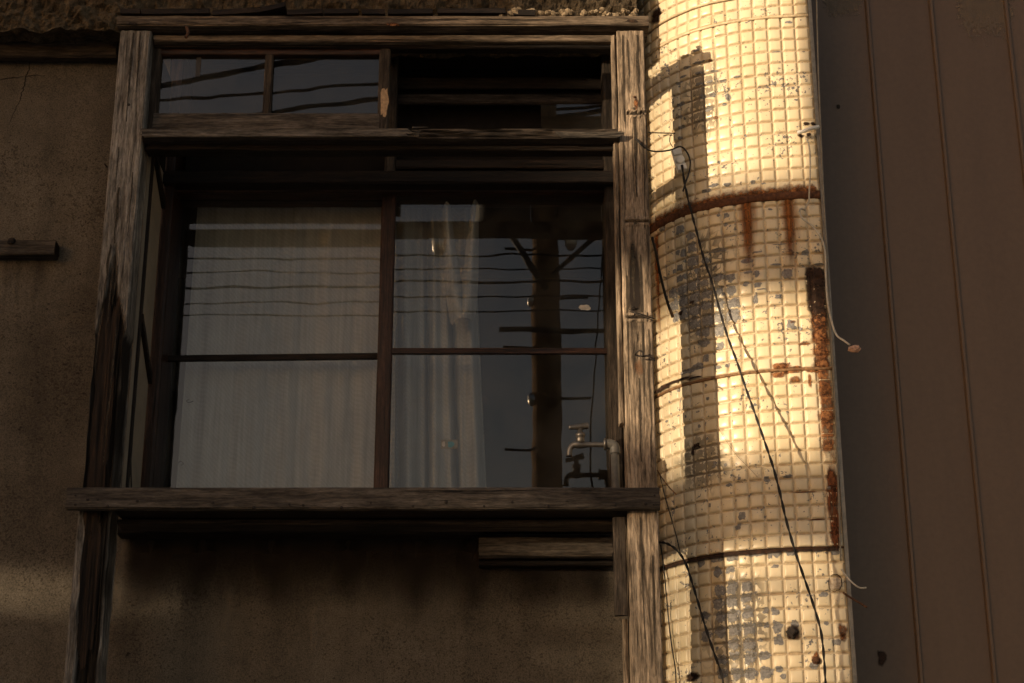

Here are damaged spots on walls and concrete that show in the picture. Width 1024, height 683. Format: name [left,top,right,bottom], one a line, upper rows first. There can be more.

peeling [676,48,741,112]
peeling [659,212,782,375]
rust [649,185,816,309]
rust [654,267,839,571]
peeling [697,547,840,681]